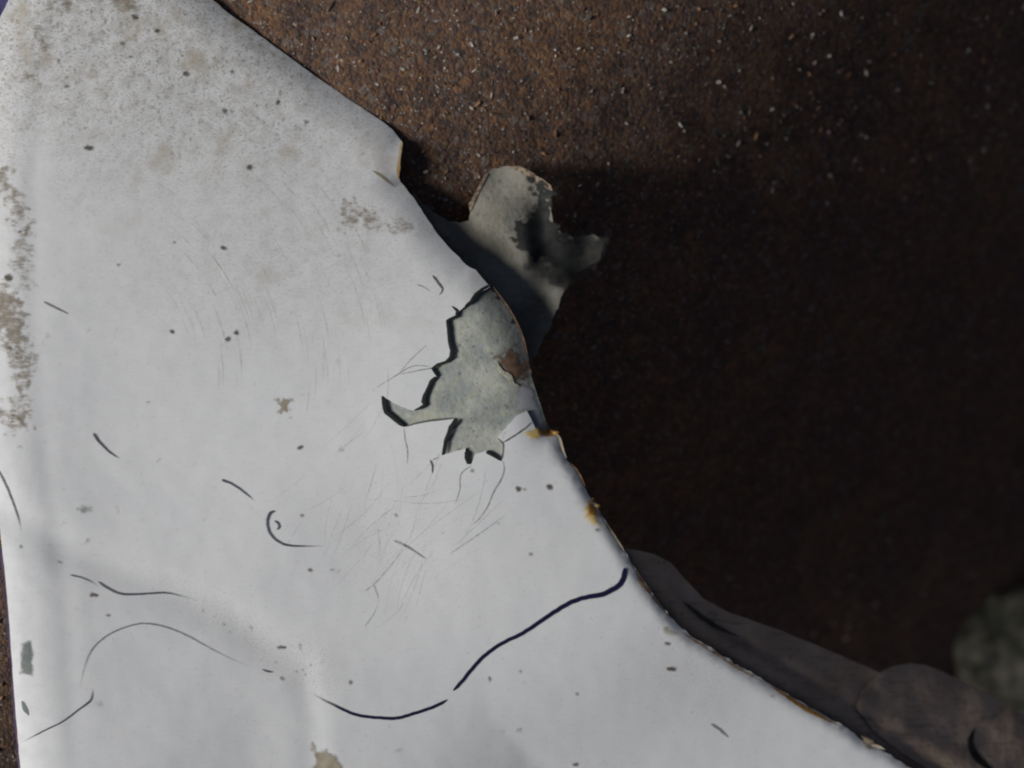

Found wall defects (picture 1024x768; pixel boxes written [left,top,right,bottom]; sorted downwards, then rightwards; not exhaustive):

corrosion [373,141,402,187]
corrosion [508,166,553,191]
peeling [509,176,607,289]
peeling [381,284,551,464]
corrosion [525,428,585,486]
corrosion [585,501,669,631]